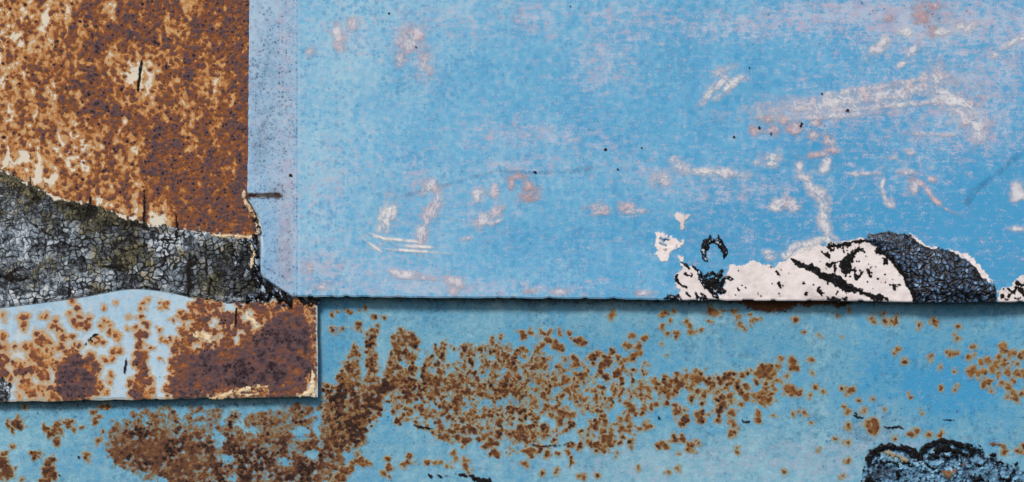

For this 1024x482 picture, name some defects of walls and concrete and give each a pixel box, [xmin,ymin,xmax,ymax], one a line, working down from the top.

rust [0,0,282,236]
crack [0,170,260,326]
peeling [655,212,913,304]
peeling [996,275,1024,302]
rust [0,296,945,482]